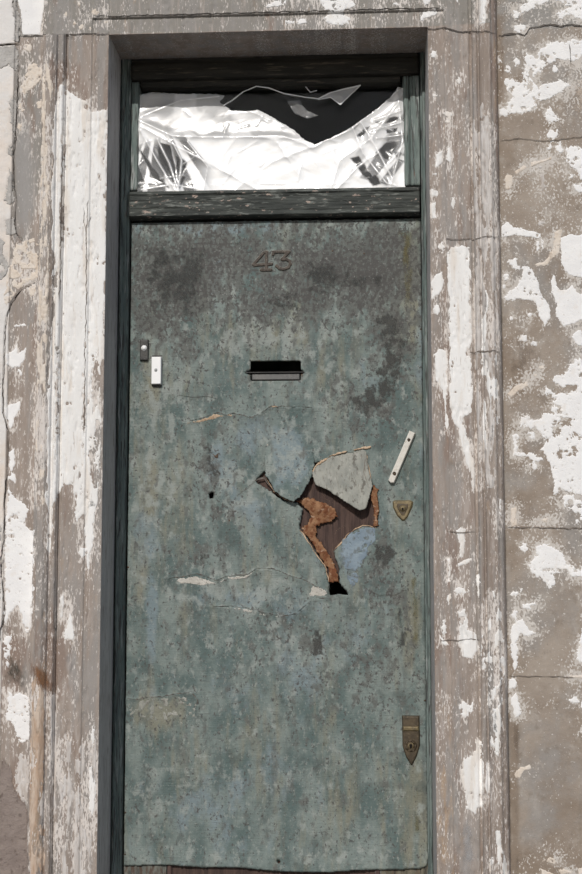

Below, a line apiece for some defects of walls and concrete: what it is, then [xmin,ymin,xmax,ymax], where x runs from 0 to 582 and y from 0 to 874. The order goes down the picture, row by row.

crack [0,7,582,63]
peeling [513,0,582,33]
peeling [499,39,582,193]
peeling [0,0,108,633]
peeling [430,103,582,493]
peeling [512,358,582,525]
crack [173,546,329,616]
peeling [340,527,376,588]
peeling [519,543,582,589]
peeling [3,634,12,667]
peeling [59,596,74,640]
peeling [440,527,536,815]